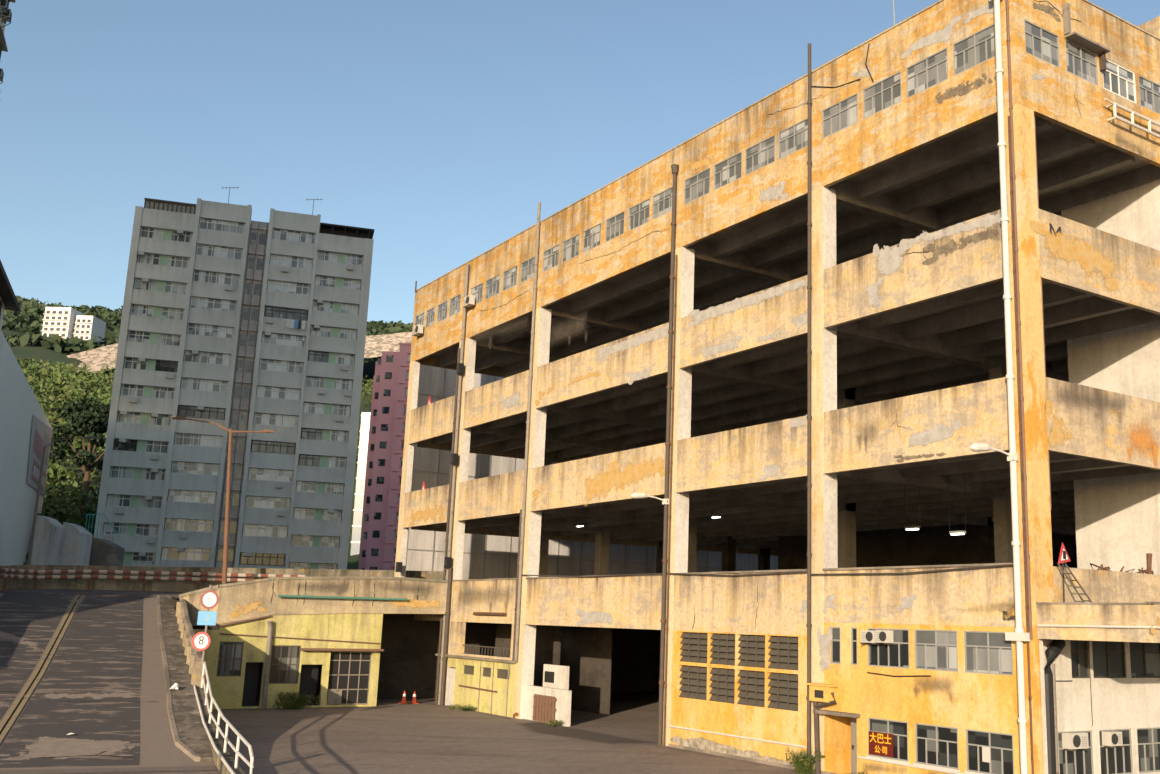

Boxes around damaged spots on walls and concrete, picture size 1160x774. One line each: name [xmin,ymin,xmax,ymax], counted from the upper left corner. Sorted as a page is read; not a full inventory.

peeling [900,3,994,59]
peeling [866,210,1001,309]
peeling [894,421,962,463]
rust [1128,430,1157,465]